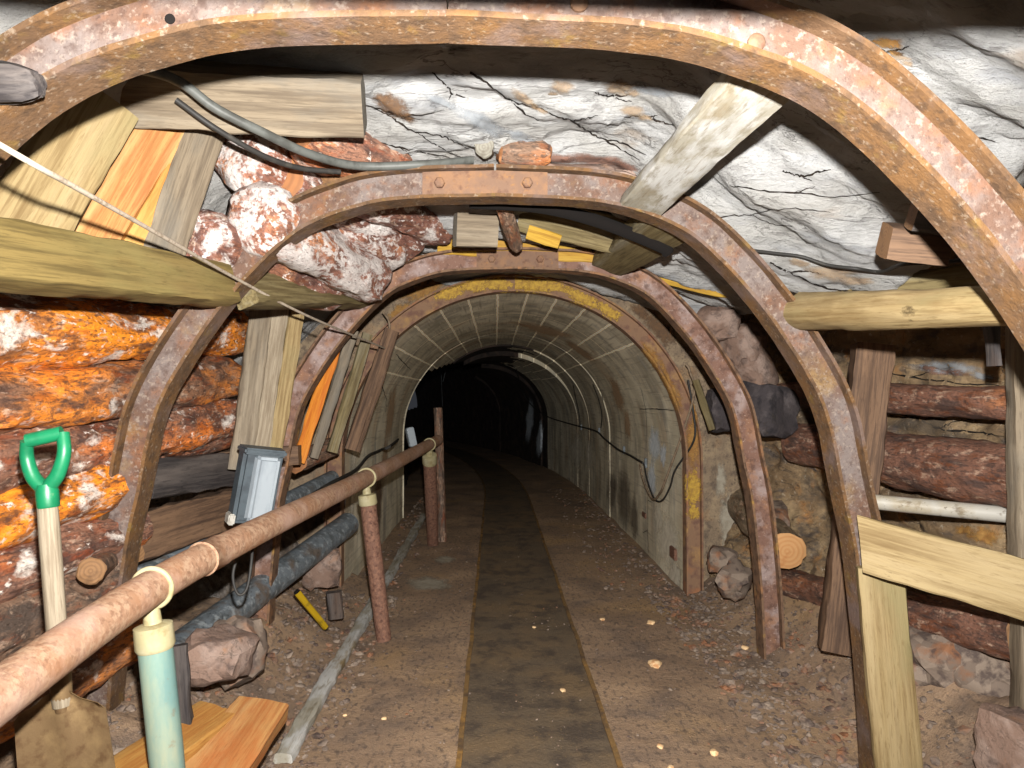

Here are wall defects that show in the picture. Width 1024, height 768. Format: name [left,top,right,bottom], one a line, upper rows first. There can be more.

rust [872,38,903,56]
rust [374,93,415,122]
rust [516,93,547,113]
crack [432,71,673,161]
rust [549,81,571,95]
crack [375,108,469,158]
rust [551,154,637,171]
crack [721,169,880,227]
crack [770,262,868,292]
rust [792,259,869,284]
rust [388,280,443,318]
rust [632,305,673,345]